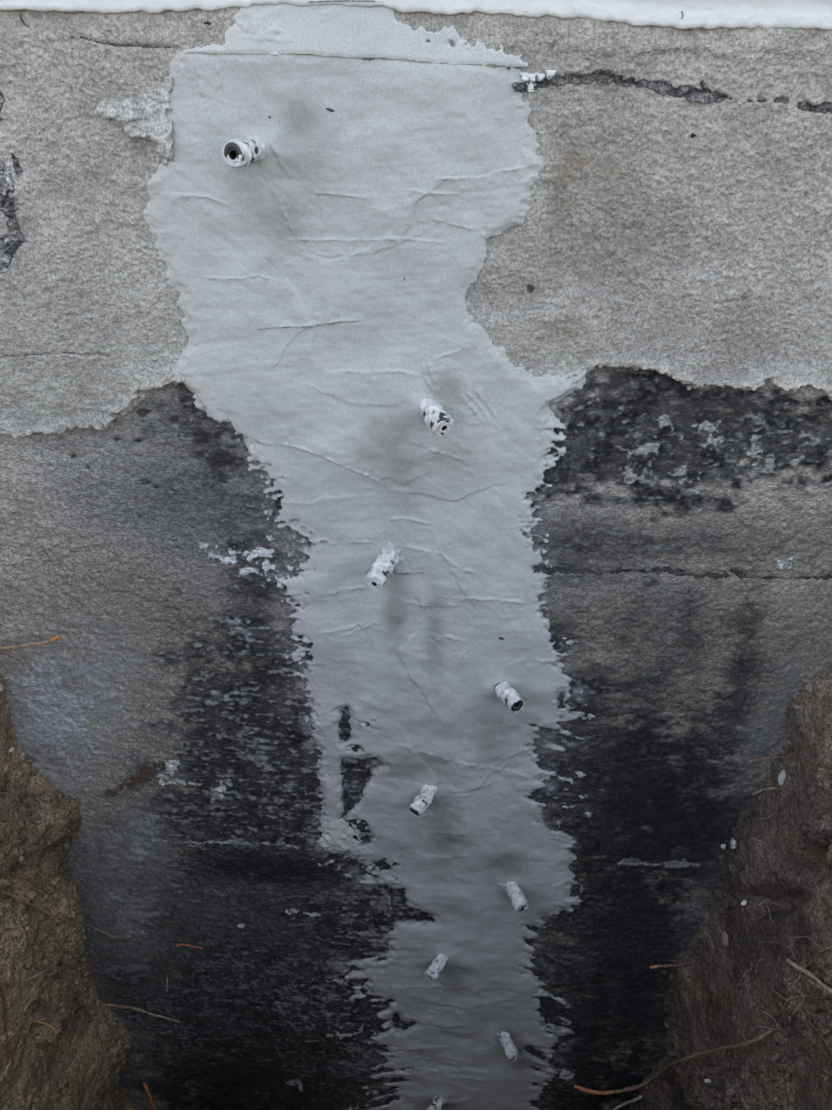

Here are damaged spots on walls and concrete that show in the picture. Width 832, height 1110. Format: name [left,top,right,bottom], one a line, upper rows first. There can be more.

crack [512,69,832,114]
spalling [571,358,832,507]
efflorescence [10,647,128,784]
leakage [101,817,326,888]
leakage [585,709,737,1000]
leakage [576,1032,651,1110]